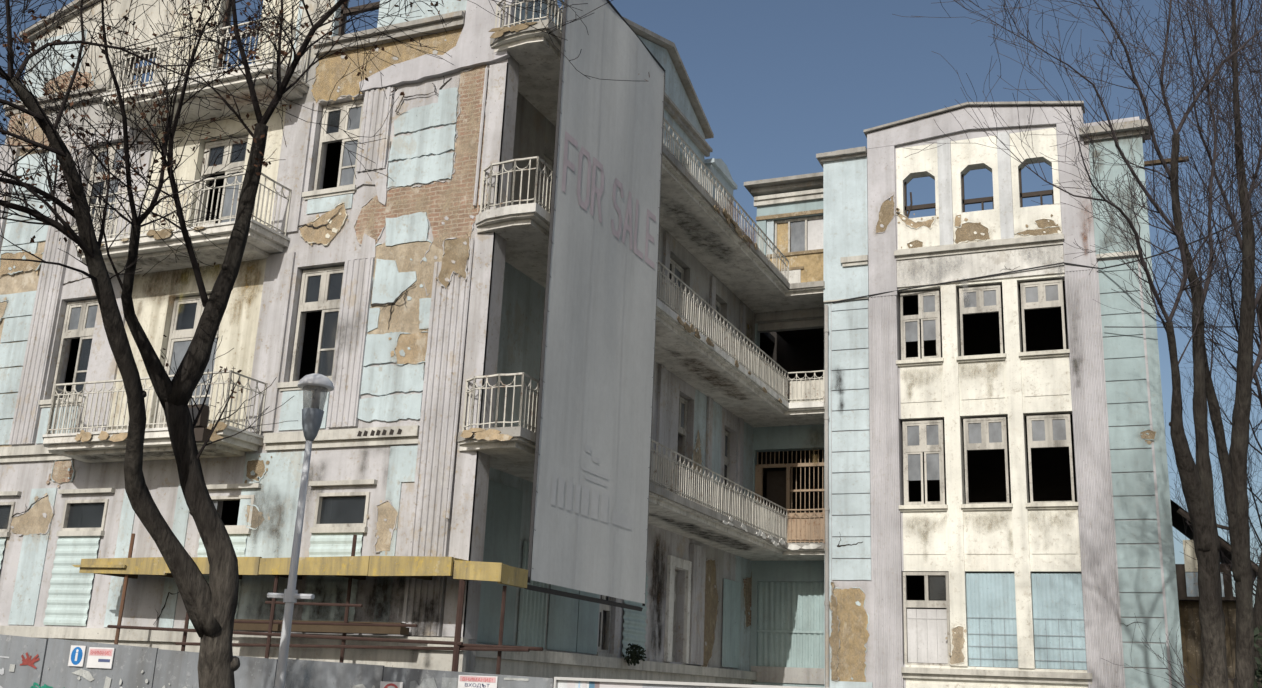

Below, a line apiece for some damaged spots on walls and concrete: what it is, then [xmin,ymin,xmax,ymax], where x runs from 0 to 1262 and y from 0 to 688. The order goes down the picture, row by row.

flaking render [310,28,463,102]
flaking render [299,64,489,366]
flaking render [876,195,939,248]
flaking render [954,214,990,244]
flaking render [1015,214,1062,236]
flaking render [9,460,75,537]
flaking render [367,500,398,555]
flaking render [701,559,719,667]
flaking render [829,581,869,682]
flaking render [945,625,967,665]